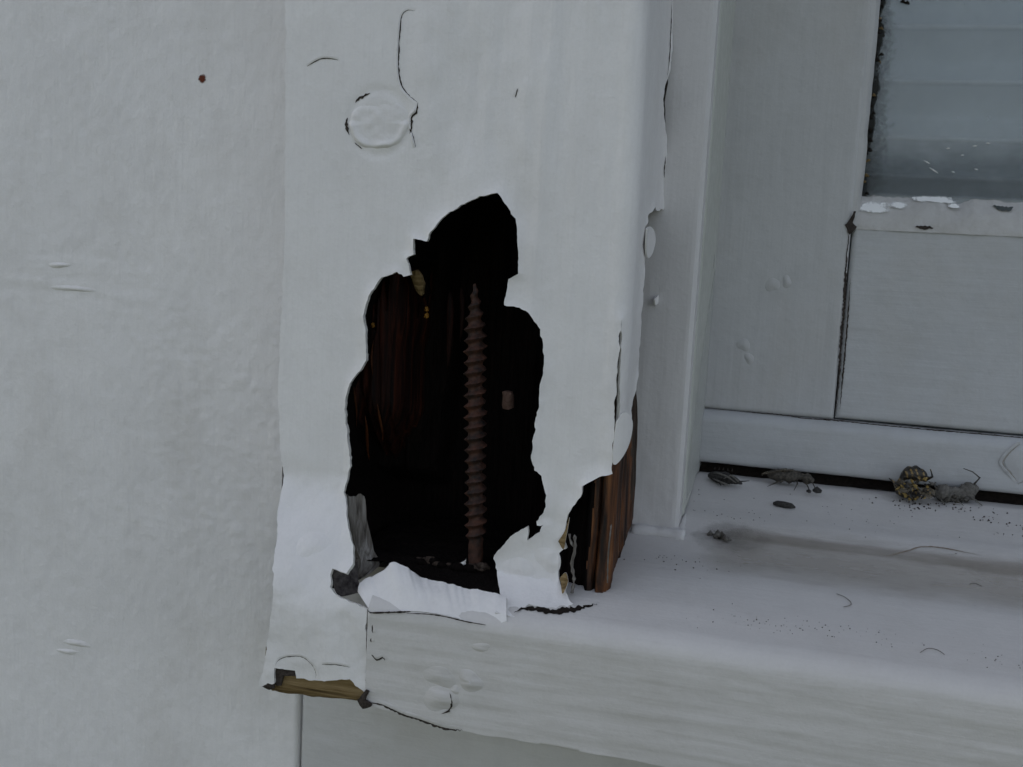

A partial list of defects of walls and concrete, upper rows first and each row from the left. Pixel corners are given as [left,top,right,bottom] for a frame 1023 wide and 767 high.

peeling [663,11,672,119]
peeling [502,390,514,410]
peeling [515,392,638,615]
peeling [333,561,359,597]
spalling [262,668,372,709]